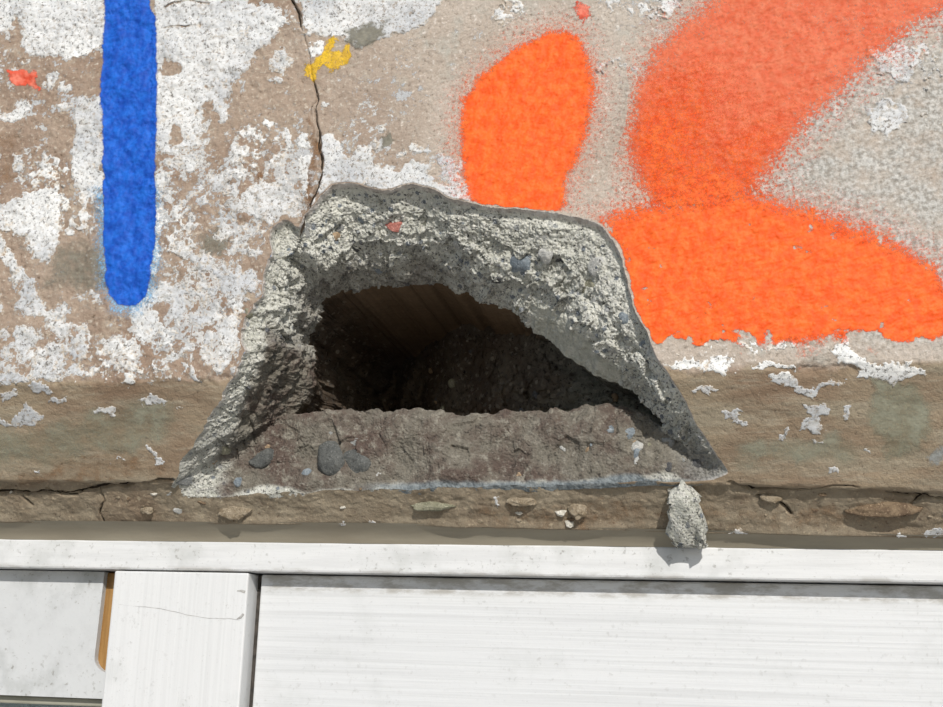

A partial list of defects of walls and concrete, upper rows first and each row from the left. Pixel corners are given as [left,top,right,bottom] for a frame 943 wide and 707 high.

crack [291,0,323,237]
peeling [862,43,943,141]
spalling [0,0,737,508]
peeling [721,408,748,427]
peeling [738,330,927,444]
crack [0,482,129,521]
peeling [922,527,943,538]